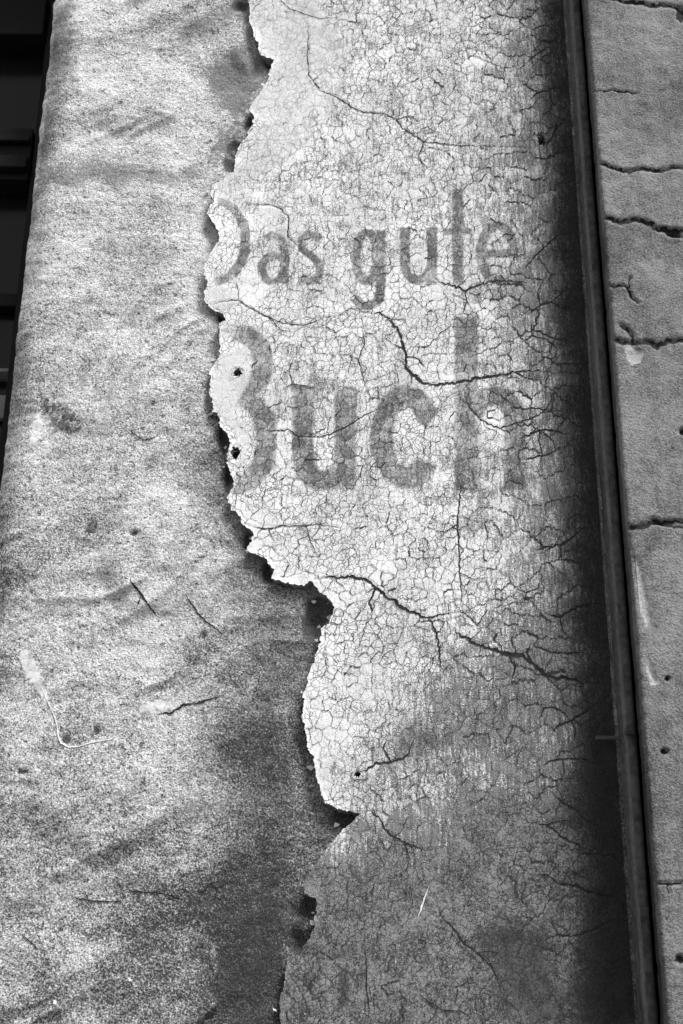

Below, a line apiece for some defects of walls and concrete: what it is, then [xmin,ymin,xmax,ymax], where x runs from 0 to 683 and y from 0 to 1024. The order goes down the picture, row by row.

crack [601,163,681,173]
crack [605,216,683,238]
crack [611,280,636,302]
crack [615,327,683,349]
peeling [0,0,360,1024]
crack [211,0,627,1024]
crack [630,519,683,530]
crack [185,594,231,640]